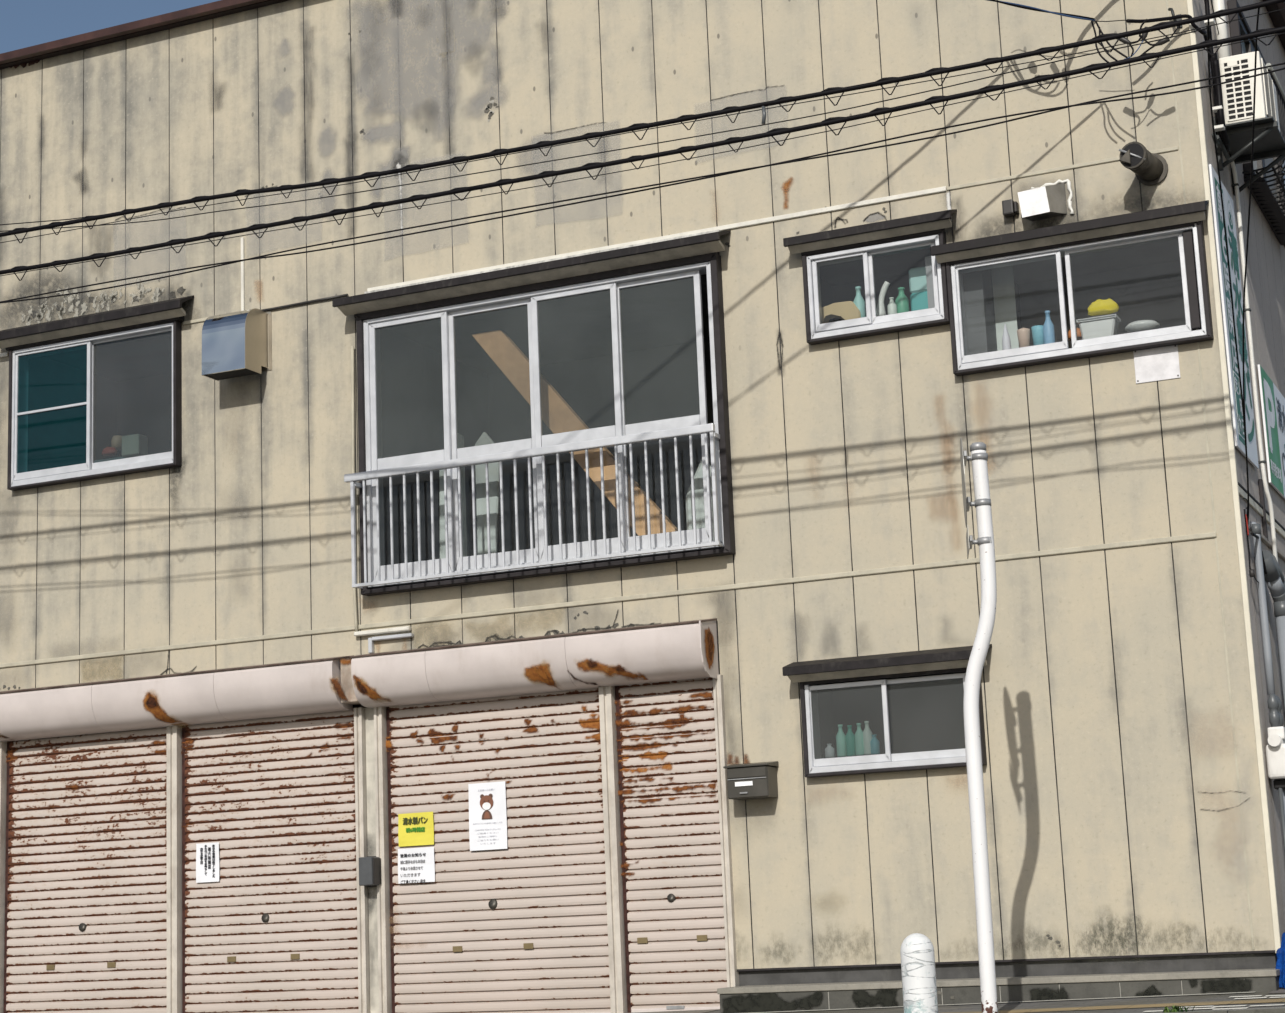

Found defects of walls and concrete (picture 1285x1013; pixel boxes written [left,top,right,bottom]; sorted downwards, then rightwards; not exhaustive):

leakage [357,0,504,229]
rust [331,659,381,701]
rust [2,736,18,762]
rust [143,693,195,755]
rust [308,722,353,756]
rust [410,723,460,752]
rust [523,719,538,733]
rust [579,692,716,804]